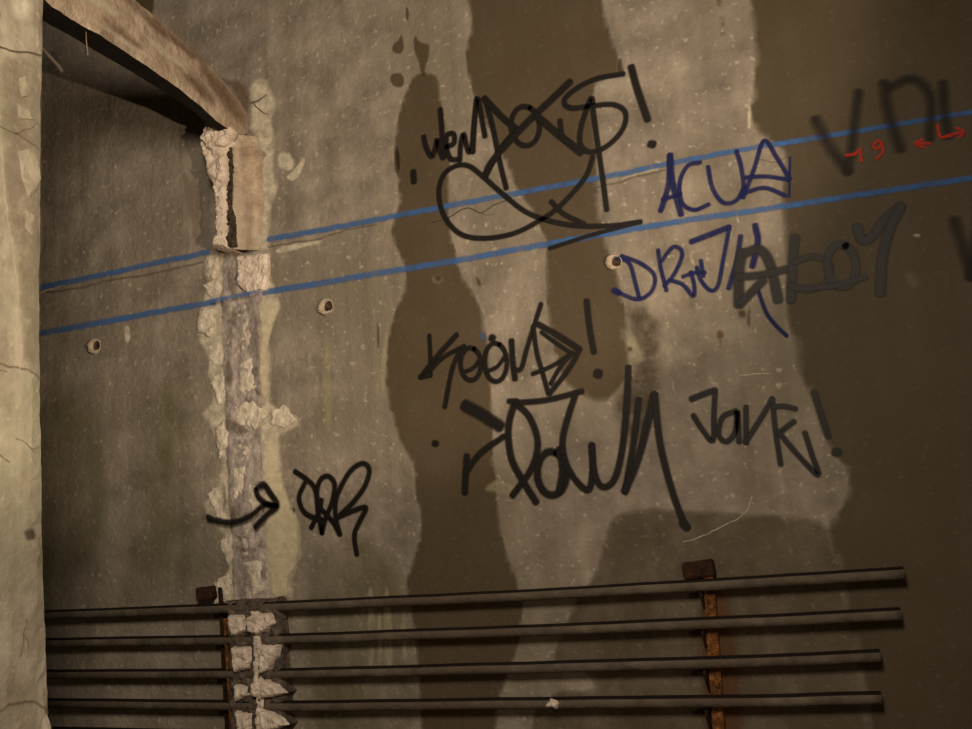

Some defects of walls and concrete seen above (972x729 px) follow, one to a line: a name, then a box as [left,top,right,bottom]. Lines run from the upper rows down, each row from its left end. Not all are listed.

crack [0,46,43,56]
spalling [197,71,305,729]
water stain [378,37,521,729]